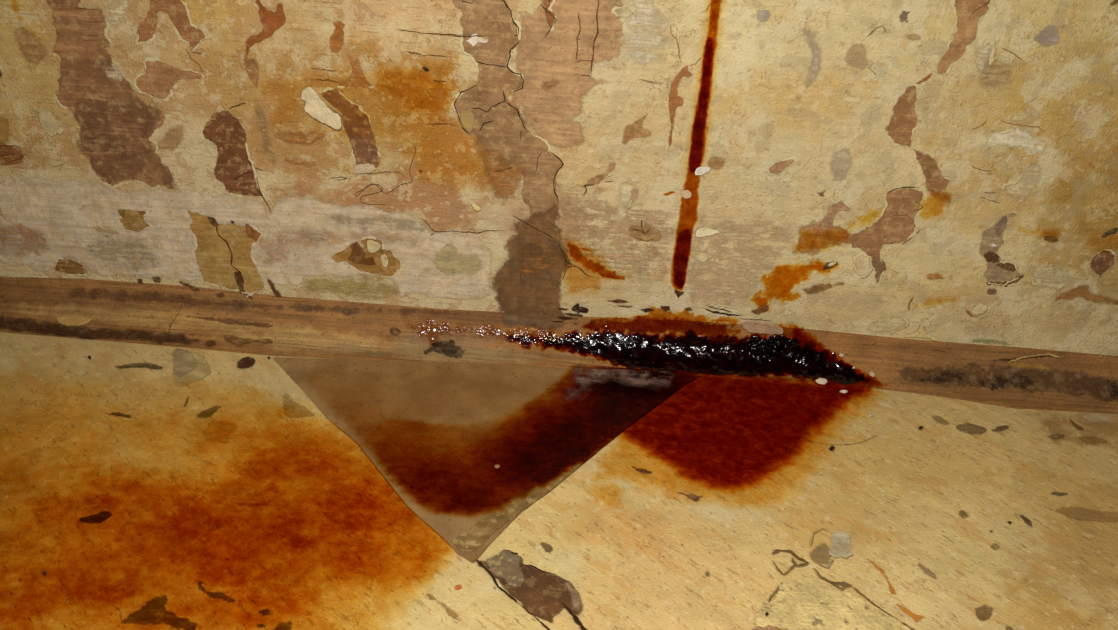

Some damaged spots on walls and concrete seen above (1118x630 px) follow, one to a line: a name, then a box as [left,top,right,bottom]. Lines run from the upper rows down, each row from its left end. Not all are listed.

peeling [47,0,205,189]
peeling [203,103,272,214]
crack [334,171,402,180]
crack [420,218,504,236]
peeling [450,0,562,214]
crack [440,0,599,204]
rust [553,303,589,324]
rust [664,0,721,298]
rust [752,262,838,314]
peeling [797,0,990,284]
rust [0,365,871,630]
crack [475,559,587,630]